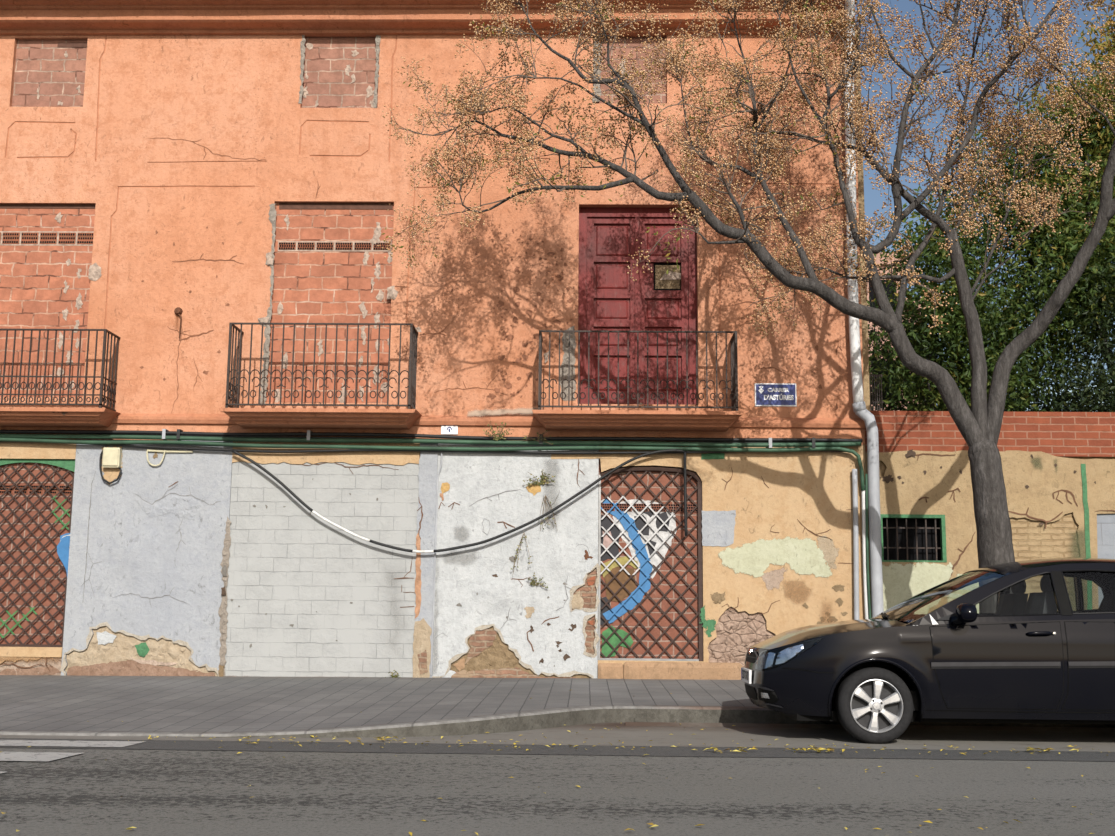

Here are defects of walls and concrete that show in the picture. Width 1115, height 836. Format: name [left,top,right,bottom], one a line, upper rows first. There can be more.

crack [150,138,266,161]
crack [167,315,213,411]
flaking render [1010,513,1078,562]
flaking render [0,517,240,677]
flaking render [412,533,600,678]
flaking render [699,592,775,668]
peeling [718,536,848,624]
flaking render [1024,575,1043,601]
flaking render [1064,577,1076,611]